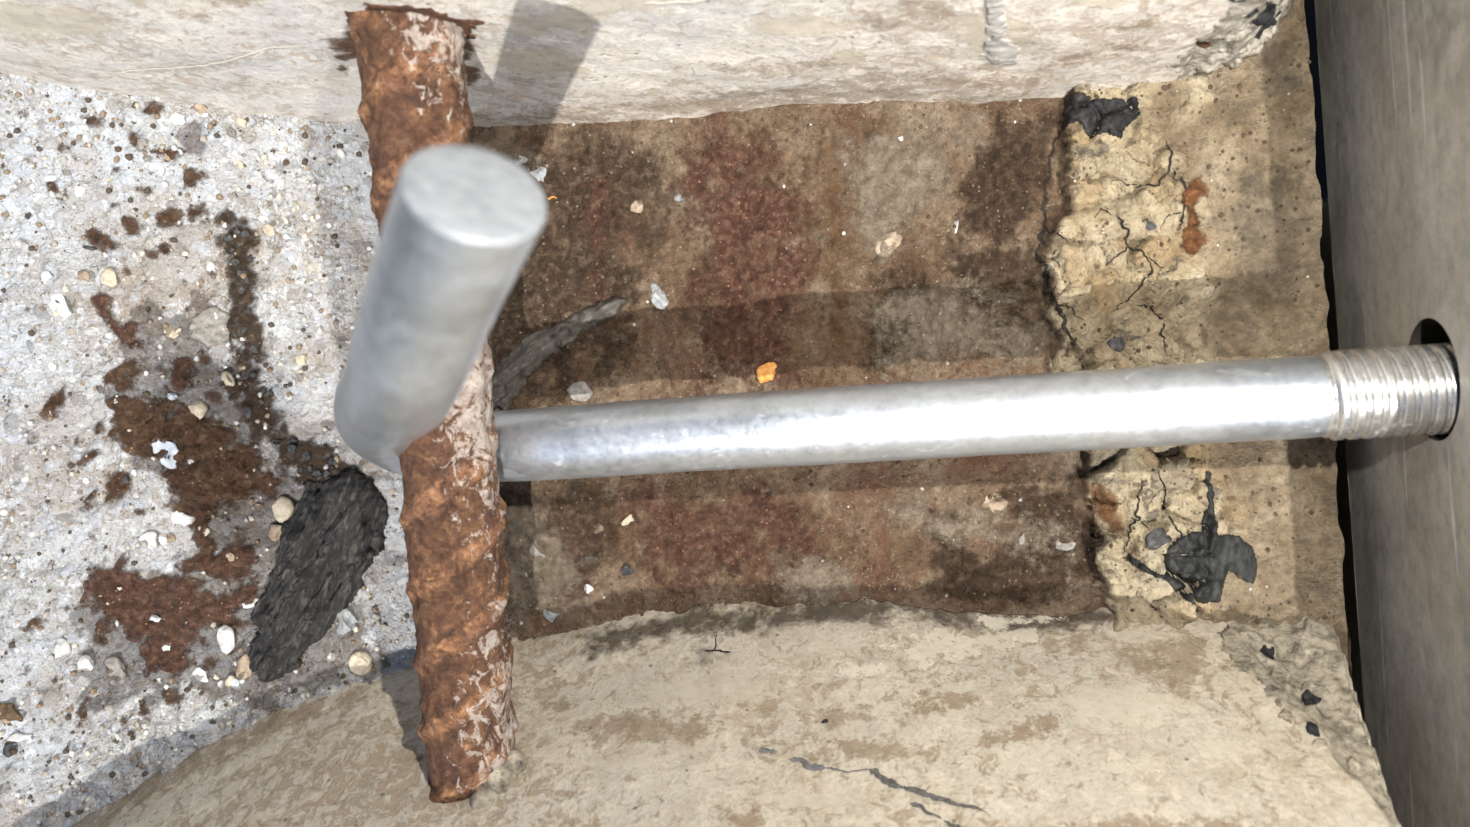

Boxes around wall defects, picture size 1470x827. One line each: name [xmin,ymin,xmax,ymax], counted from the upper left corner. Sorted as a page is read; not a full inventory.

rust [329,3,485,86]
spalling [1166,0,1294,81]
spalling [631,200,644,213]
crack [1035,127,1188,351]
rust [1177,177,1210,255]
spalling [756,362,777,384]
rust [65,292,284,726]
spalling [595,514,635,533]
spalling [982,492,1008,517]
crack [1122,470,1183,554]
rust [60,696,91,727]
crack [759,747,986,827]